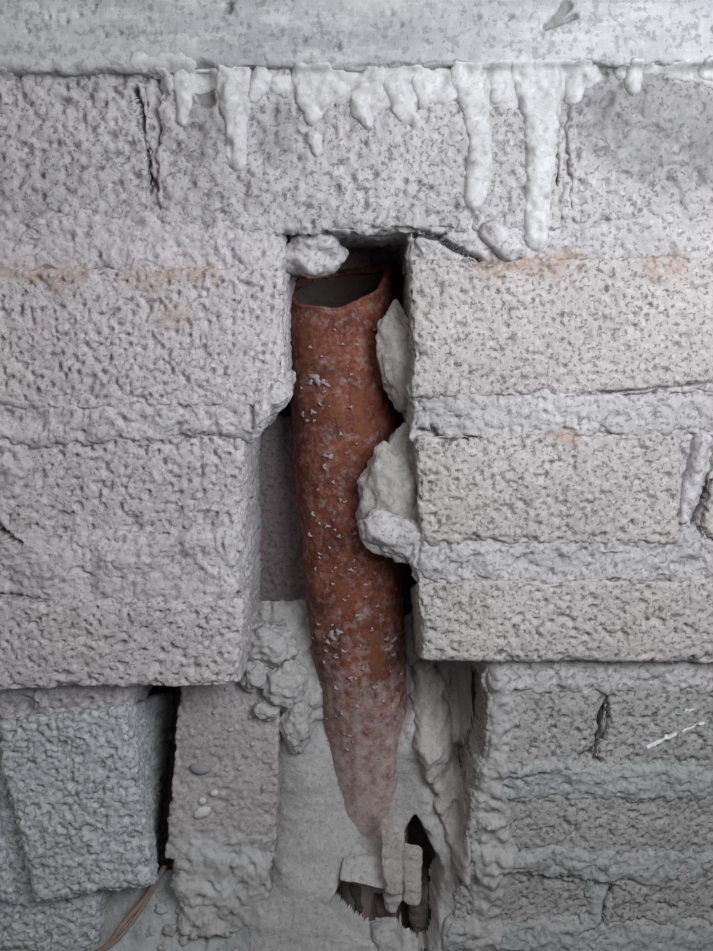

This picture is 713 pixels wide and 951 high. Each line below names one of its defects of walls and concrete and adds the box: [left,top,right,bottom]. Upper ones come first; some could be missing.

crack [133,89,160,194]
crack [579,701,610,756]
peeling [340,853,403,922]